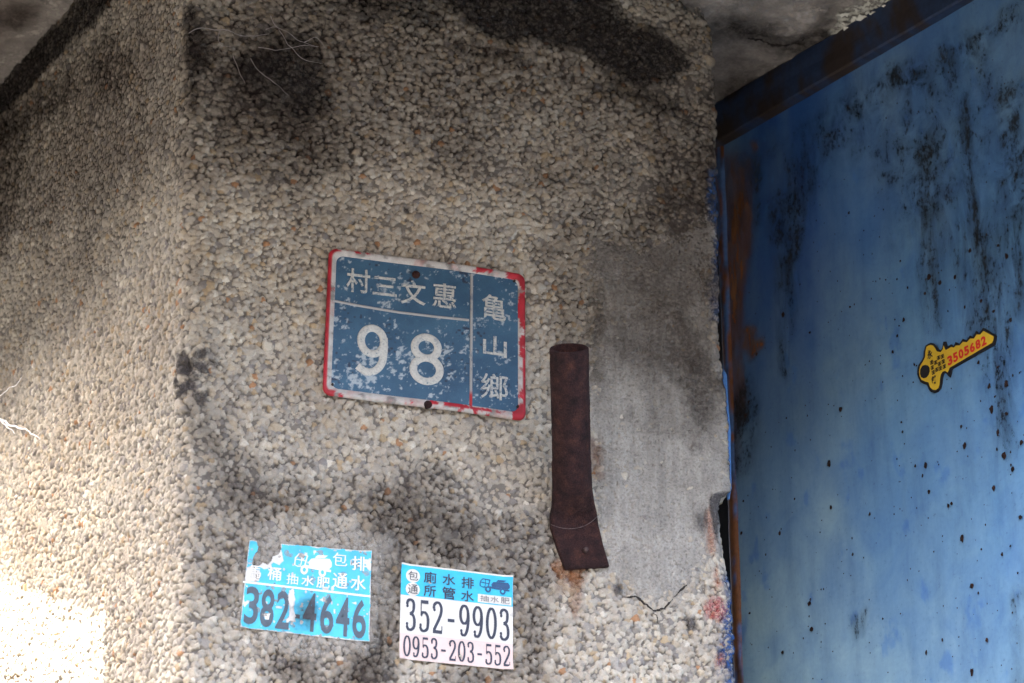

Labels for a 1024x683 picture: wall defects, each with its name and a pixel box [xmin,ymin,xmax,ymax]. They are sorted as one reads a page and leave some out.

leakage [0,0,163,239]
leakage [186,0,830,204]
rust [726,161,764,358]
leakage [818,4,1024,420]
crack [627,583,688,623]
spalling [699,492,726,537]